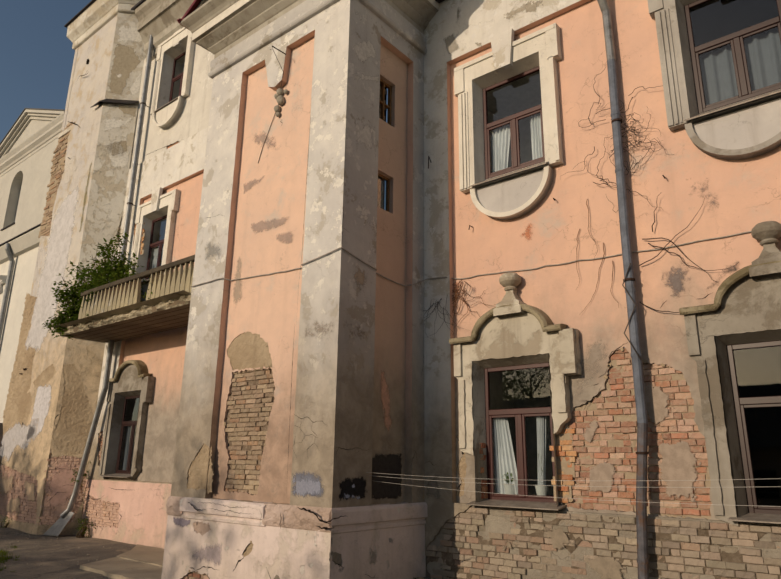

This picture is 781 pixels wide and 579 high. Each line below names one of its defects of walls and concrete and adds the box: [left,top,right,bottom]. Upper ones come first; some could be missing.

flaking render [0,293,120,527]
flaking render [183,570,209,579]
flaking render [187,443,214,494]
flaking render [224,331,275,495]
crack [188,492,344,529]
flaking render [549,348,637,512]
flaking render [642,359,712,519]